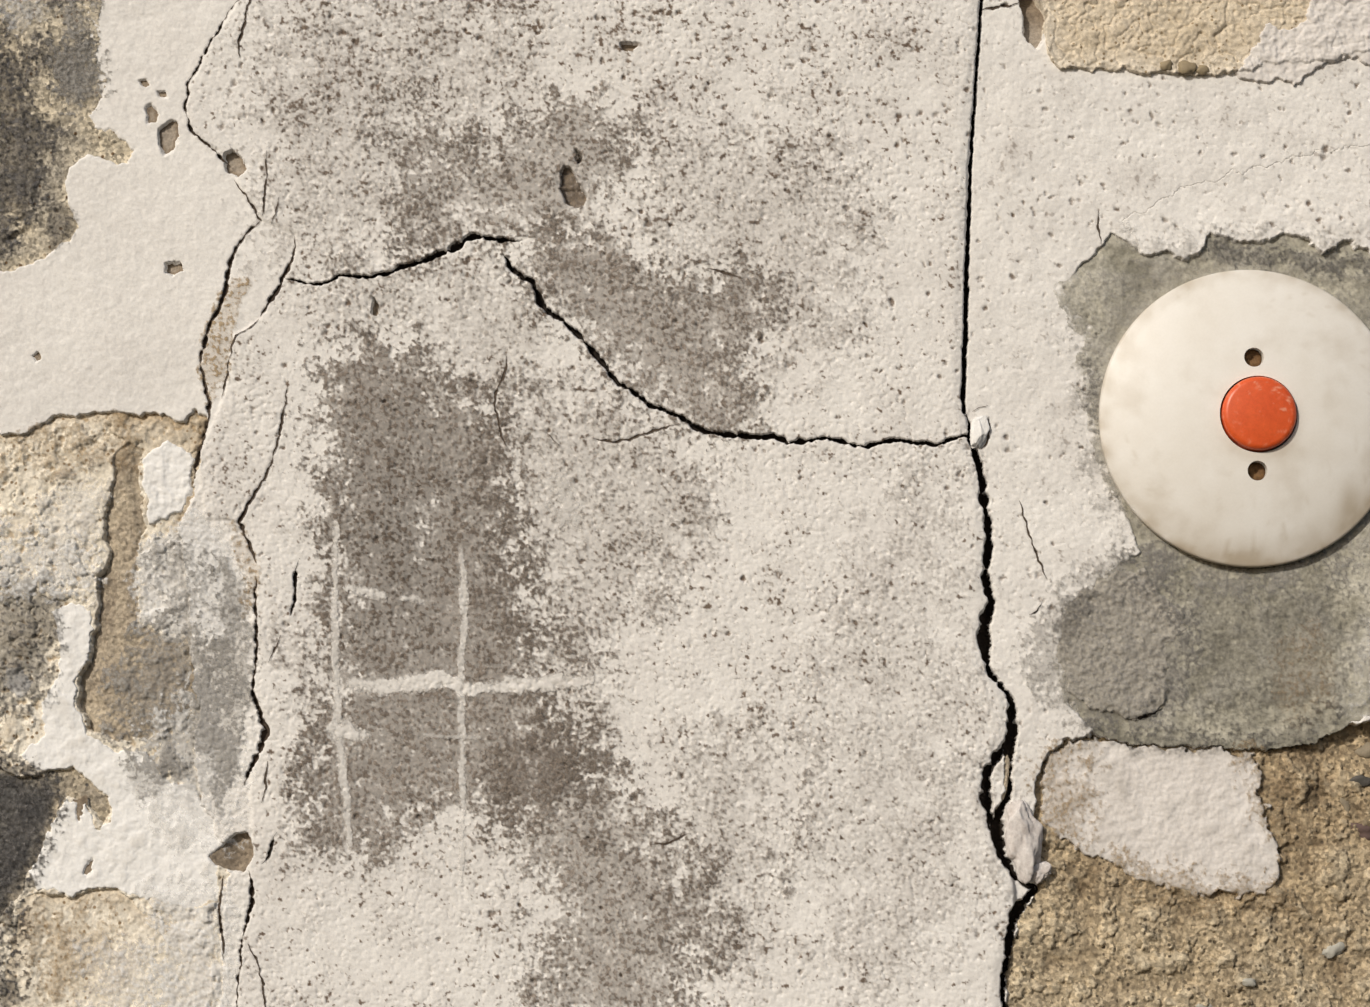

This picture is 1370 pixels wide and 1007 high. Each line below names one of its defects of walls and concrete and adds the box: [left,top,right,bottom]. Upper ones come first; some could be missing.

damp [0,0,116,258]
peeling [0,0,133,272]
peeling [140,81,179,154]
peeling [167,263,183,275]
peeling [226,152,247,177]
flaking render [1033,0,1370,87]
crack [184,0,1046,1007]
peeling [0,411,254,1007]
peeling [1056,568,1187,721]
spalling [1004,722,1370,1007]